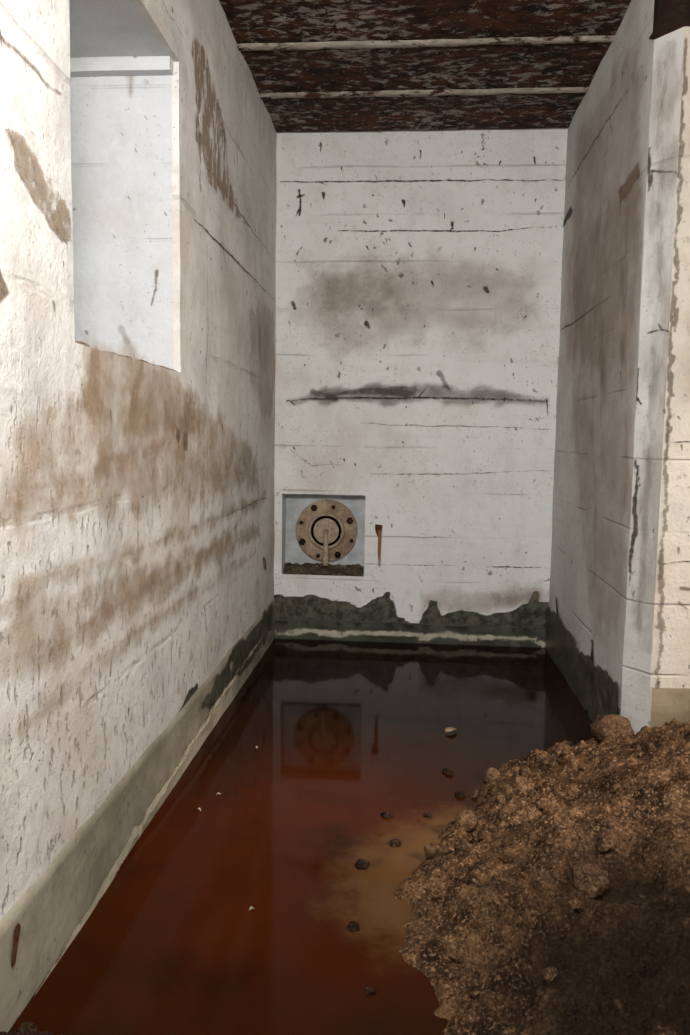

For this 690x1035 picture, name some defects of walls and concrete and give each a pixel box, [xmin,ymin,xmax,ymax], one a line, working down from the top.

peeling [7,129,71,242]
peeling [192,38,240,218]
peeling [0,270,9,301]
water stain [85,346,255,500]
water stain [359,387,410,396]
crack [628,460,640,581]
water stain [35,591,618,995]